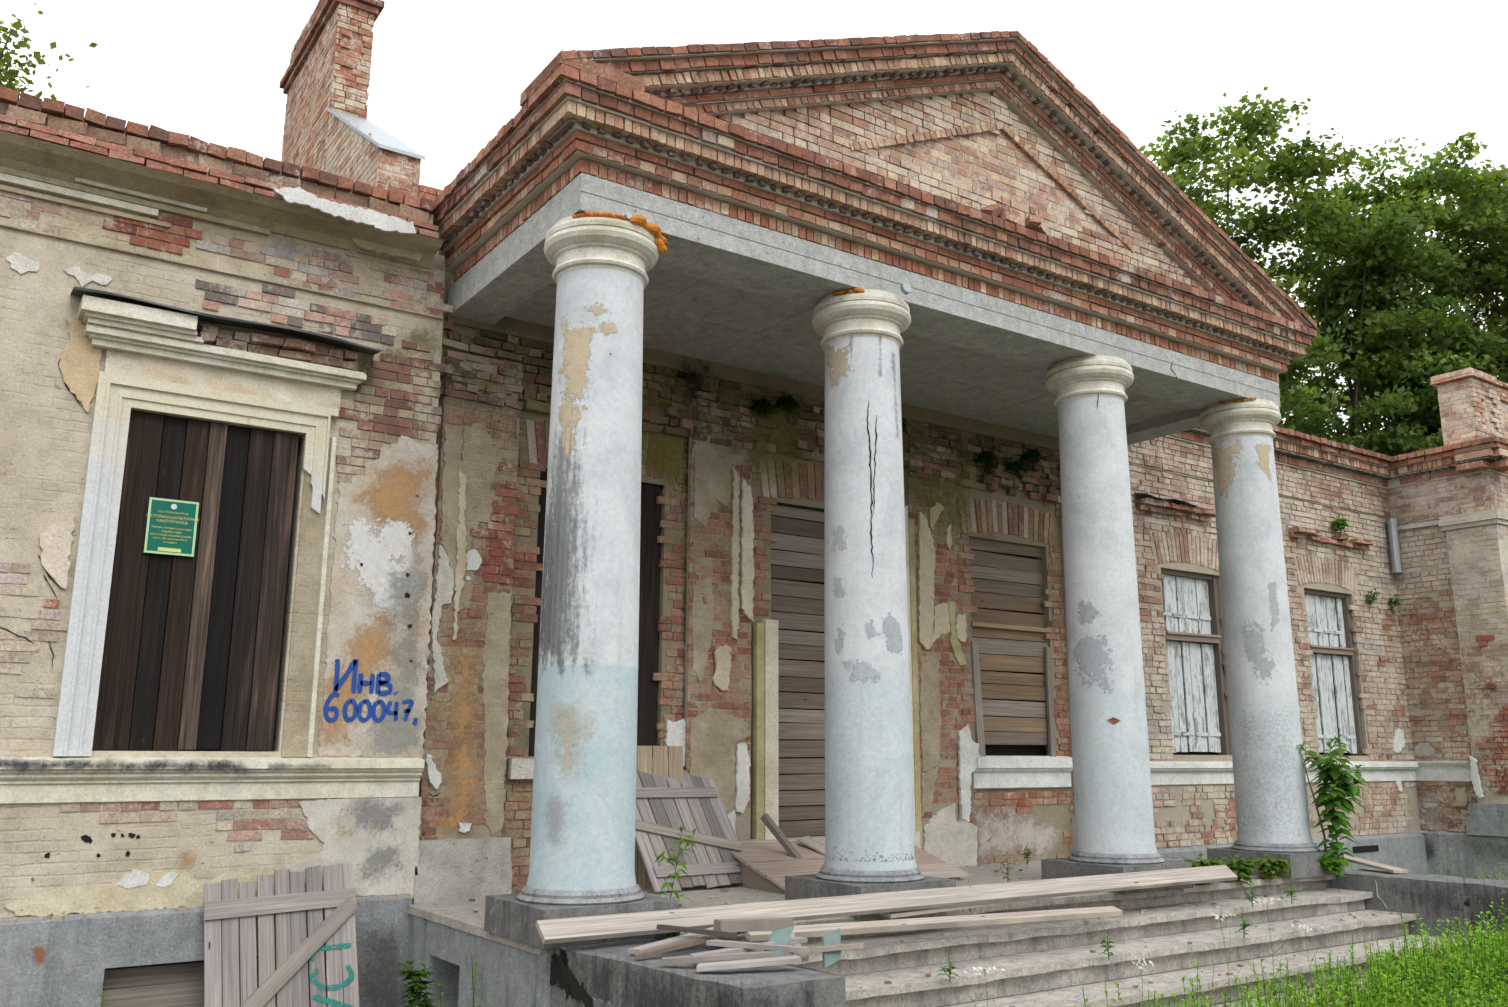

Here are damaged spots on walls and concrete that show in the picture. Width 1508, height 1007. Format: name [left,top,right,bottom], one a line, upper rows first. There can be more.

peeling [0,187,520,916]
leakage [439,320,554,415]
leakage [540,430,587,673]
peeling [558,302,618,457]
leakage [642,362,825,463]
crack [867,404,877,578]
leakage [896,405,1061,504]
peeling [689,429,755,832]
peeling [1073,600,1114,694]
peeling [1242,582,1280,685]
flaking render [1435,705,1508,829]
crack [559,949,612,1007]